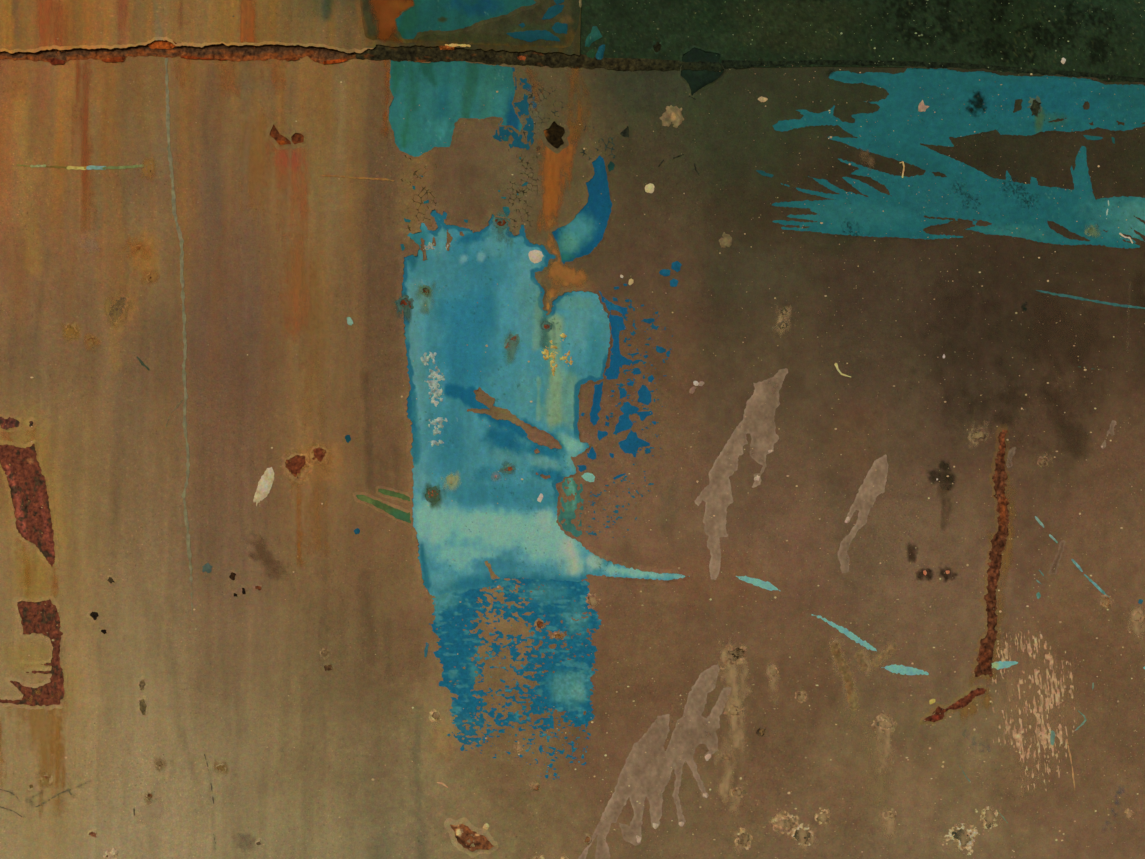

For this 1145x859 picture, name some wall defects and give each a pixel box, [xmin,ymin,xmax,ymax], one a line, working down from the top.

peeling [384,59,570,190]
peeling [394,0,568,47]
peeling [585,26,605,60]
spalling [1027,96,1042,117]
corrosion [538,103,586,347]
corrosion [0,412,59,569]
corrosion [285,447,326,478]
peeling [396,151,695,780]
corrosion [919,423,1013,726]
corrosion [0,596,68,711]